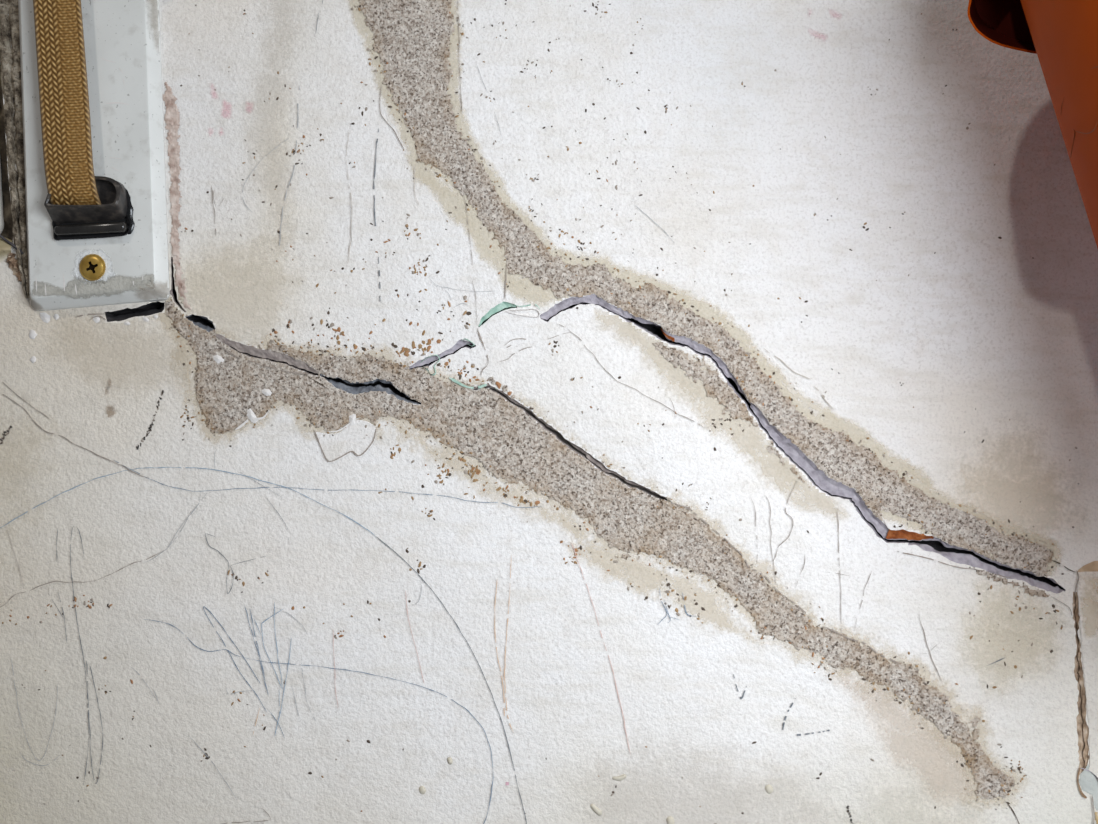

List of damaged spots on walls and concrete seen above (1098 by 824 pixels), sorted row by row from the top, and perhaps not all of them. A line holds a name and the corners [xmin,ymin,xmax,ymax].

spalling [125,188,135,234]
flaking render [143,82,1027,810]
crack [186,198,1089,775]
flaking render [351,0,1064,578]
flaking render [1077,764,1098,824]